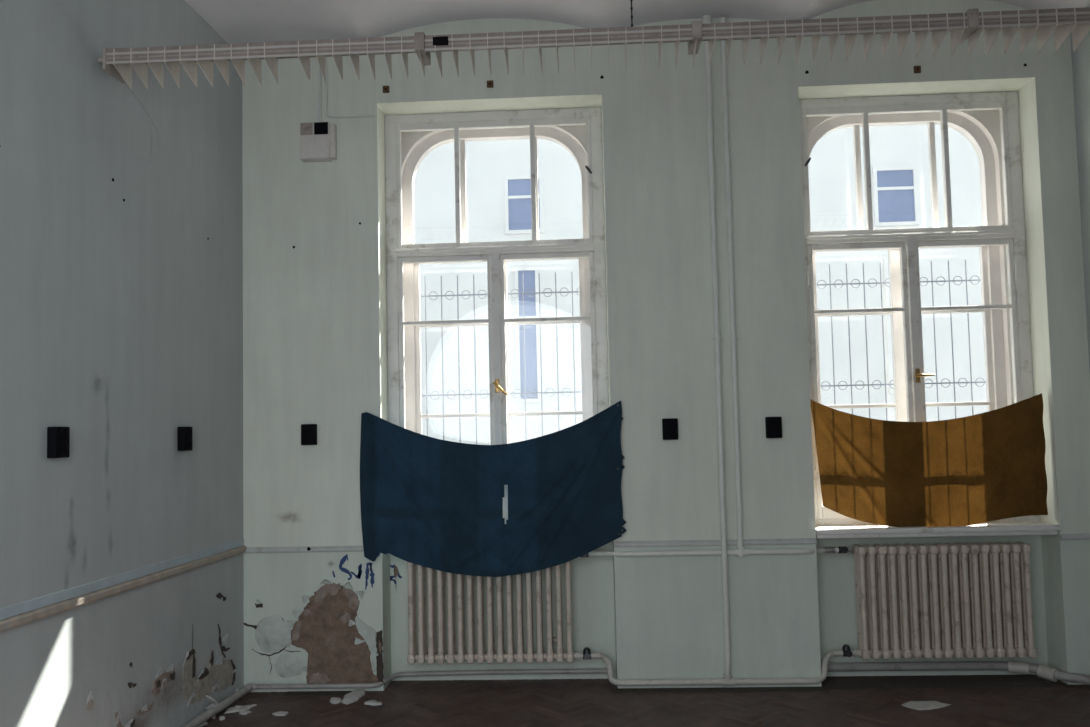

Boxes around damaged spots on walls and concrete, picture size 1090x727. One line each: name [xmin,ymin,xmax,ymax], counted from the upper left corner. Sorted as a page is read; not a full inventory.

peeling [114,623,236,727]
spalling [283,579,384,684]